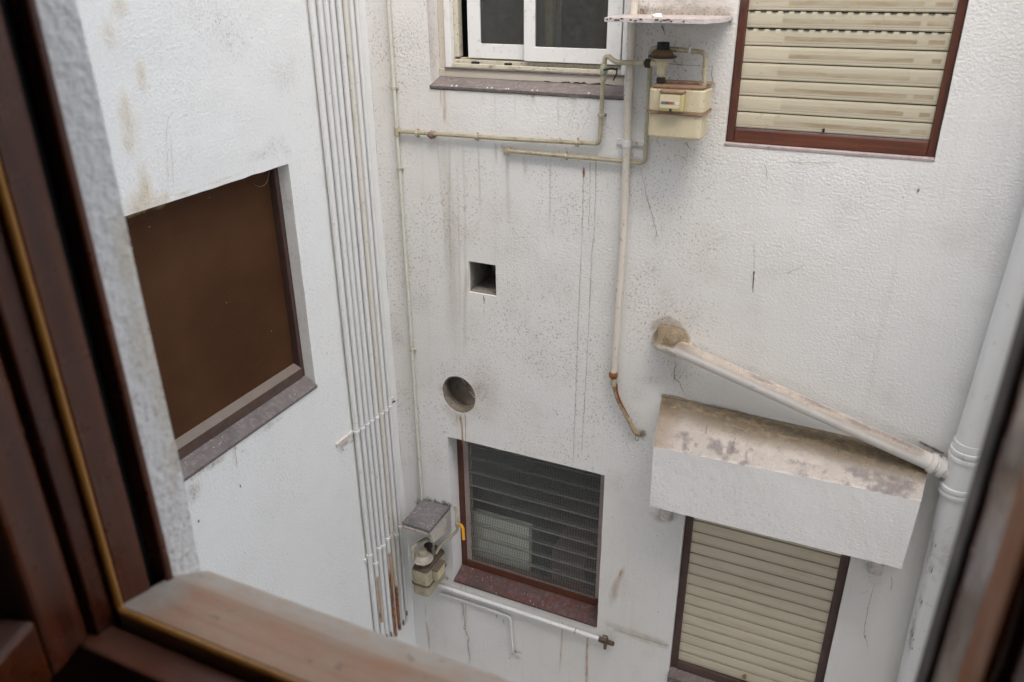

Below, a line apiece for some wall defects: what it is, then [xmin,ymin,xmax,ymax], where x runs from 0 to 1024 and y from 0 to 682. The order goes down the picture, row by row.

water stain [657,394,927,498]